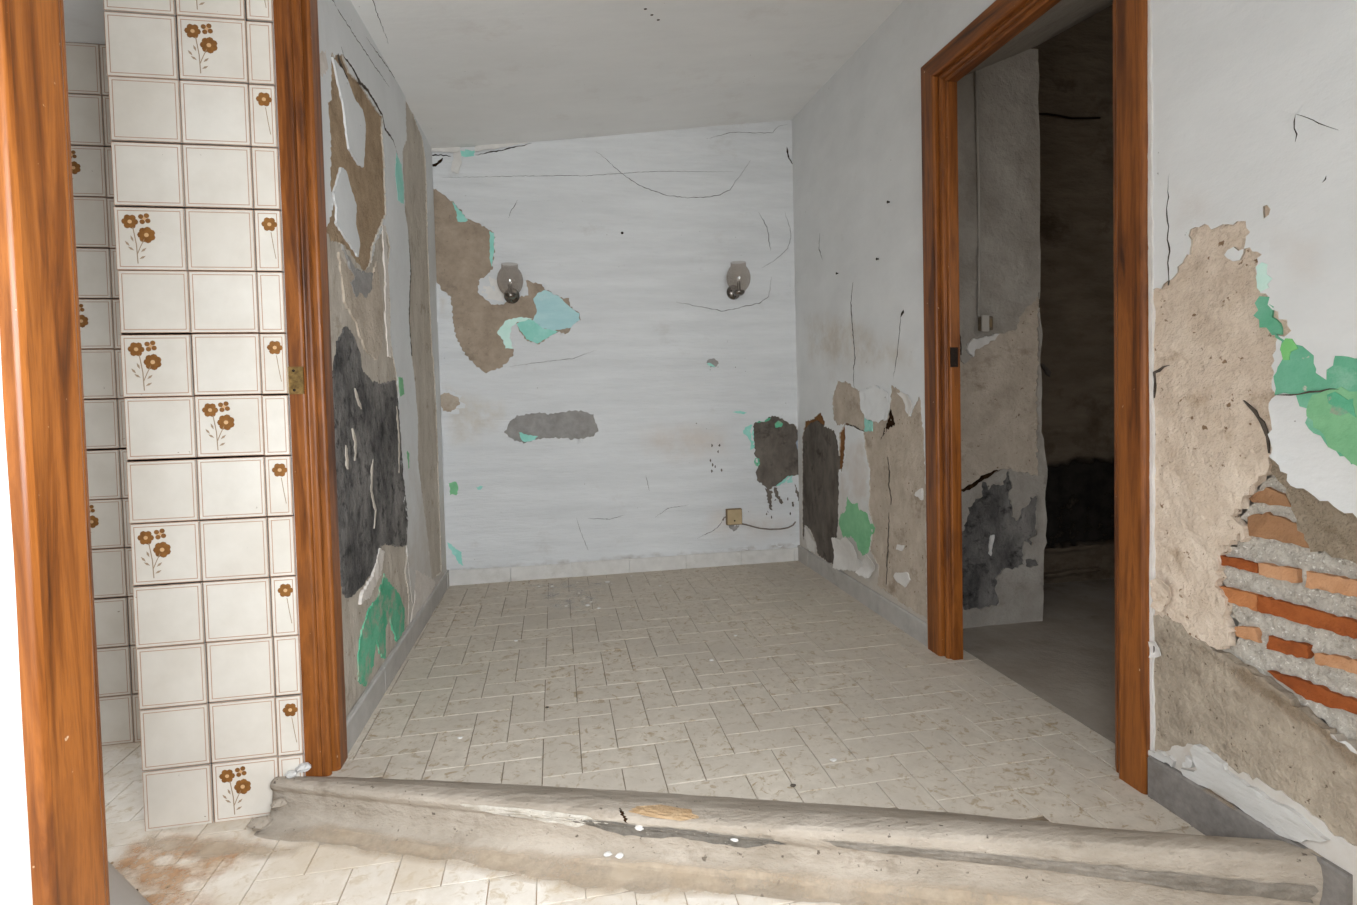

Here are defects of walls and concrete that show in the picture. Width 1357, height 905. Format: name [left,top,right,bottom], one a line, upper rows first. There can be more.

flaking render [319,50,397,385]
crack [332,0,398,155]
crack [432,143,531,216]
crack [554,124,793,198]
crack [1293,114,1337,141]
flaking render [403,102,581,578]
flaking render [504,410,598,444]
flaking render [734,411,799,519]
flaking render [831,381,927,618]
flaking render [960,297,1051,489]
flaking render [1153,221,1357,740]
flaking render [341,544,408,718]